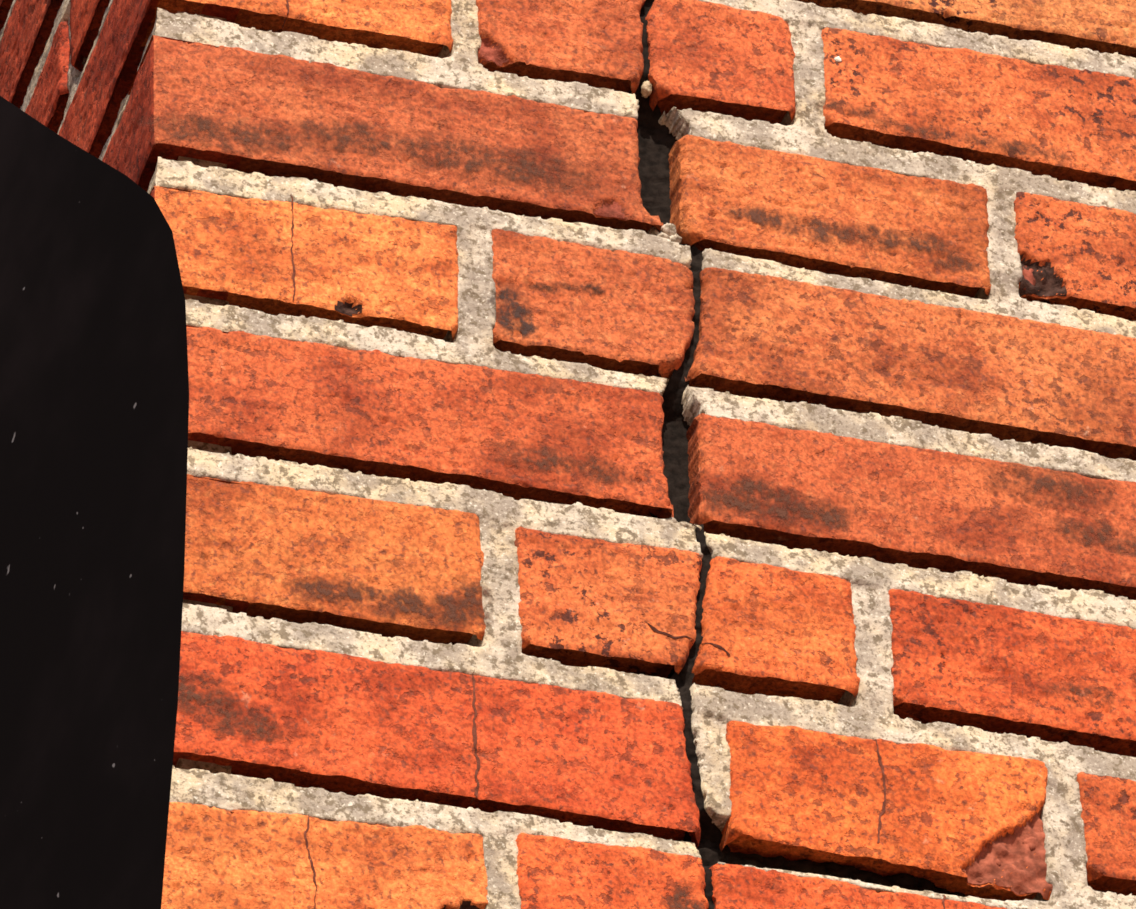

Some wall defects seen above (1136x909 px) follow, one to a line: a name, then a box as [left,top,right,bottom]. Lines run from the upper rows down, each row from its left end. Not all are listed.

spalling [1019,254,1067,297]
crack [629,0,731,909]
crack [304,814,317,909]
spalling [460,900,480,909]
spalling [697,802,1053,899]